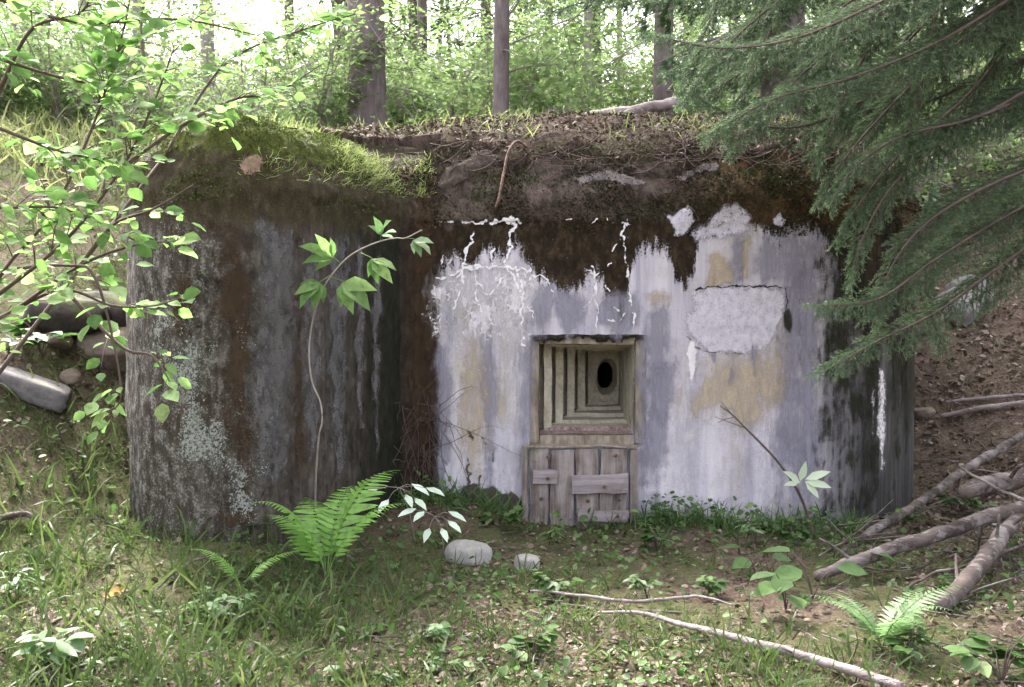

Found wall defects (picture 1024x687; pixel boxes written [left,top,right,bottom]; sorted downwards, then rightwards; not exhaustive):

damp [245,219,384,493]
damp [423,216,674,509]
peeling [667,205,750,240]
spalling [671,284,792,487]
damp [758,213,913,523]